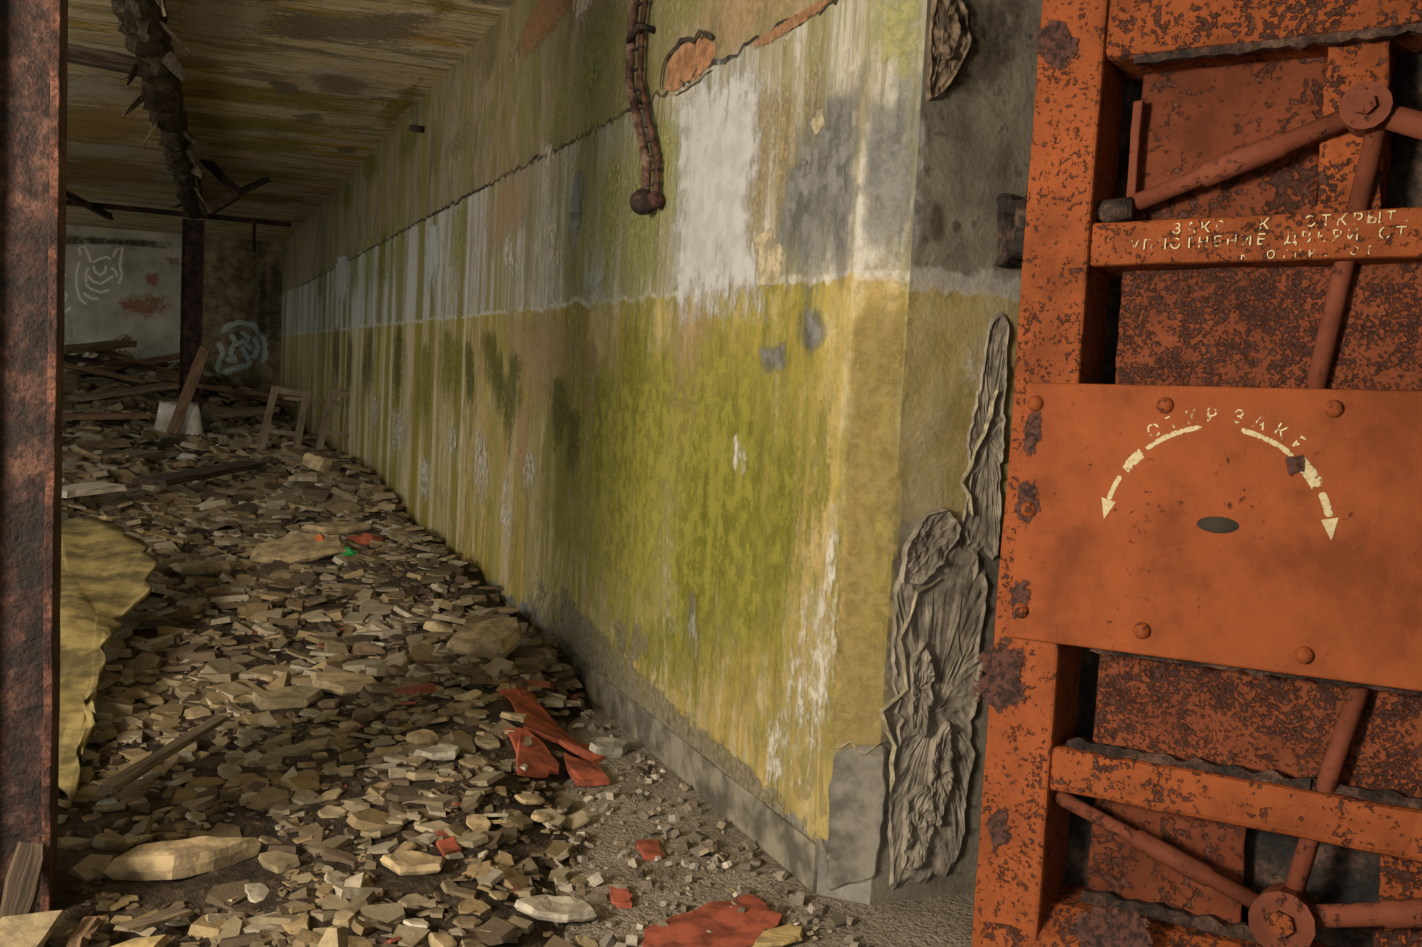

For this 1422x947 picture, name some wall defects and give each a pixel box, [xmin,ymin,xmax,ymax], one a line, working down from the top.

spalling [660,0,830,96]
rust [1033,20,1079,71]
water stain [803,296,823,349]
water stain [475,428,535,542]
water stain [733,435,746,470]
water stain [664,564,698,649]
peeling [879,311,1009,890]
water stain [767,508,838,789]
rust [972,636,1027,714]
rust [1090,648,1422,695]
rust [1066,737,1422,809]
rust [1060,887,1260,947]